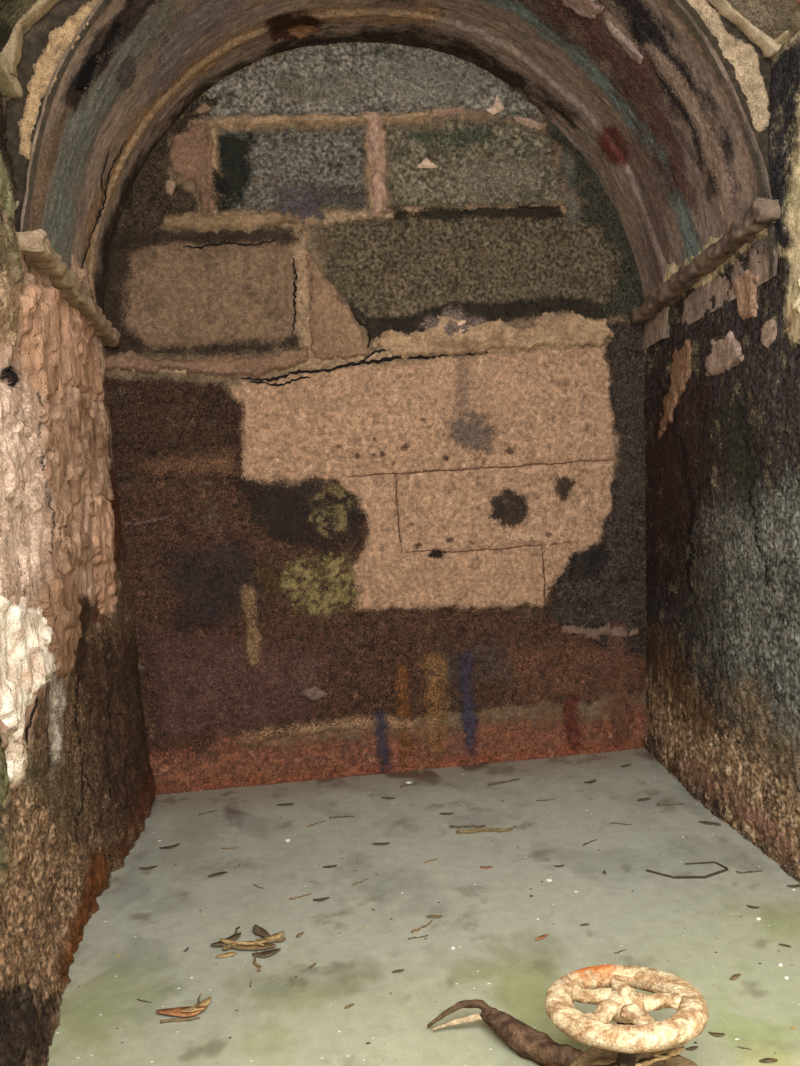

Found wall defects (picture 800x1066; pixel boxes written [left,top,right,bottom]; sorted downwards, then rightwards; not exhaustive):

flaking render [687,0,771,132]
crack [241,308,488,386]
flaking render [0,253,614,790]
damp [0,235,800,1066]
flaking render [561,623,639,641]